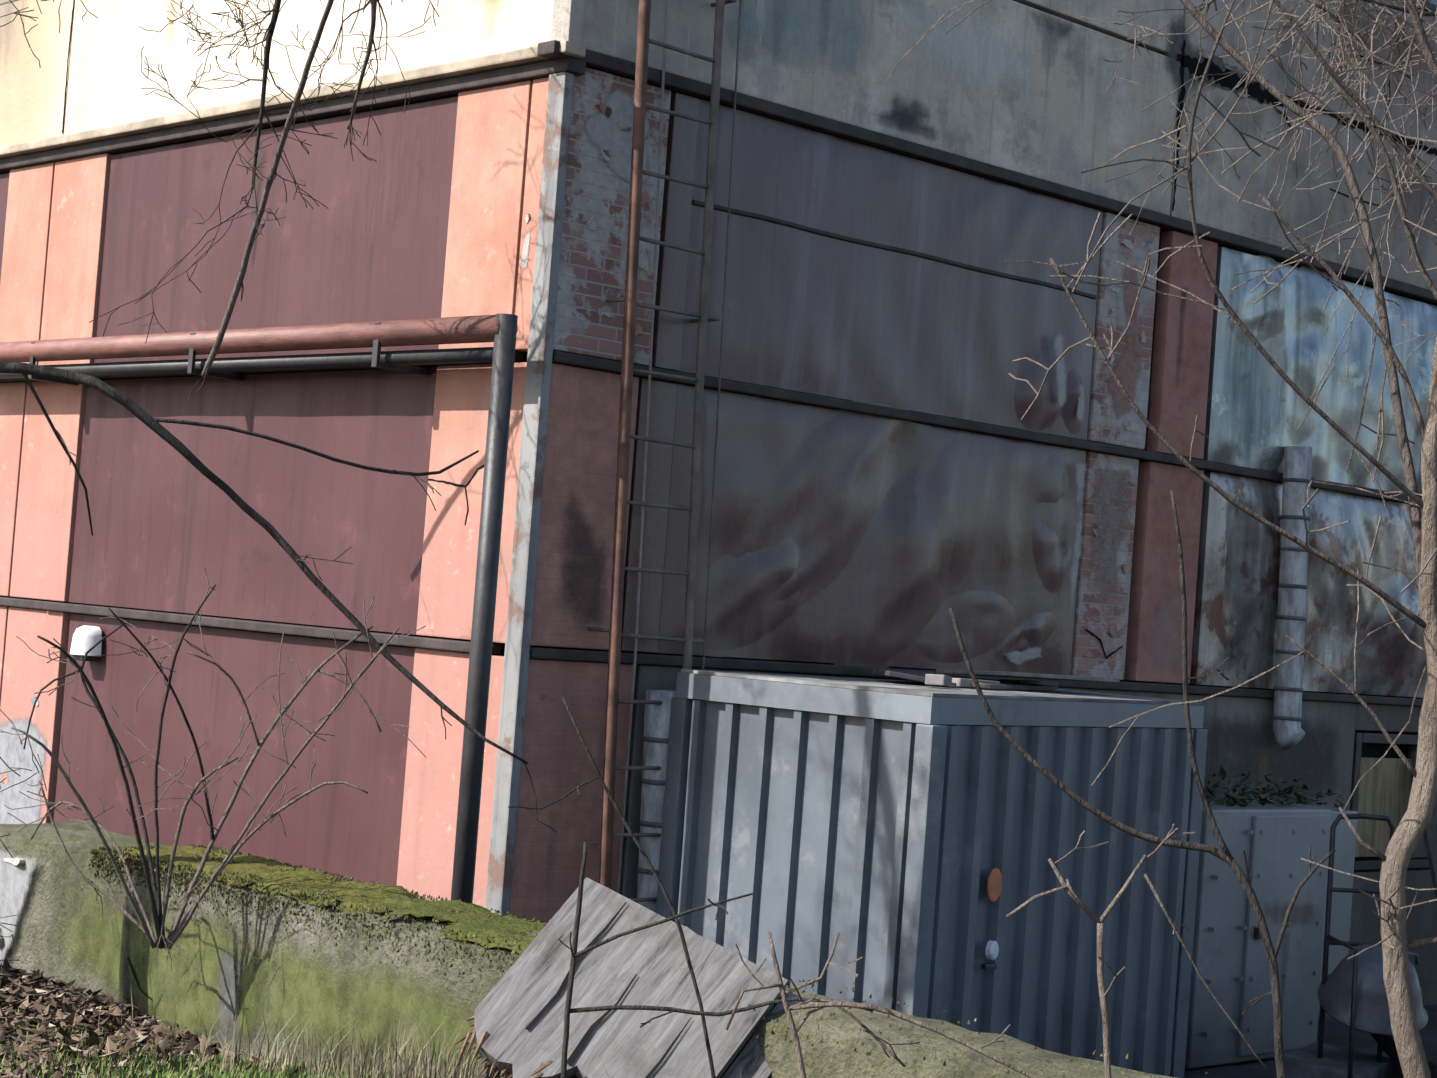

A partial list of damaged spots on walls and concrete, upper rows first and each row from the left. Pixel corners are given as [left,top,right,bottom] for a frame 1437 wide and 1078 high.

peeling [585,90,650,207]
water stain [883,99,931,133]
peeling [1106,267,1150,430]
peeling [0,697,46,824]
spalling [0,851,35,964]